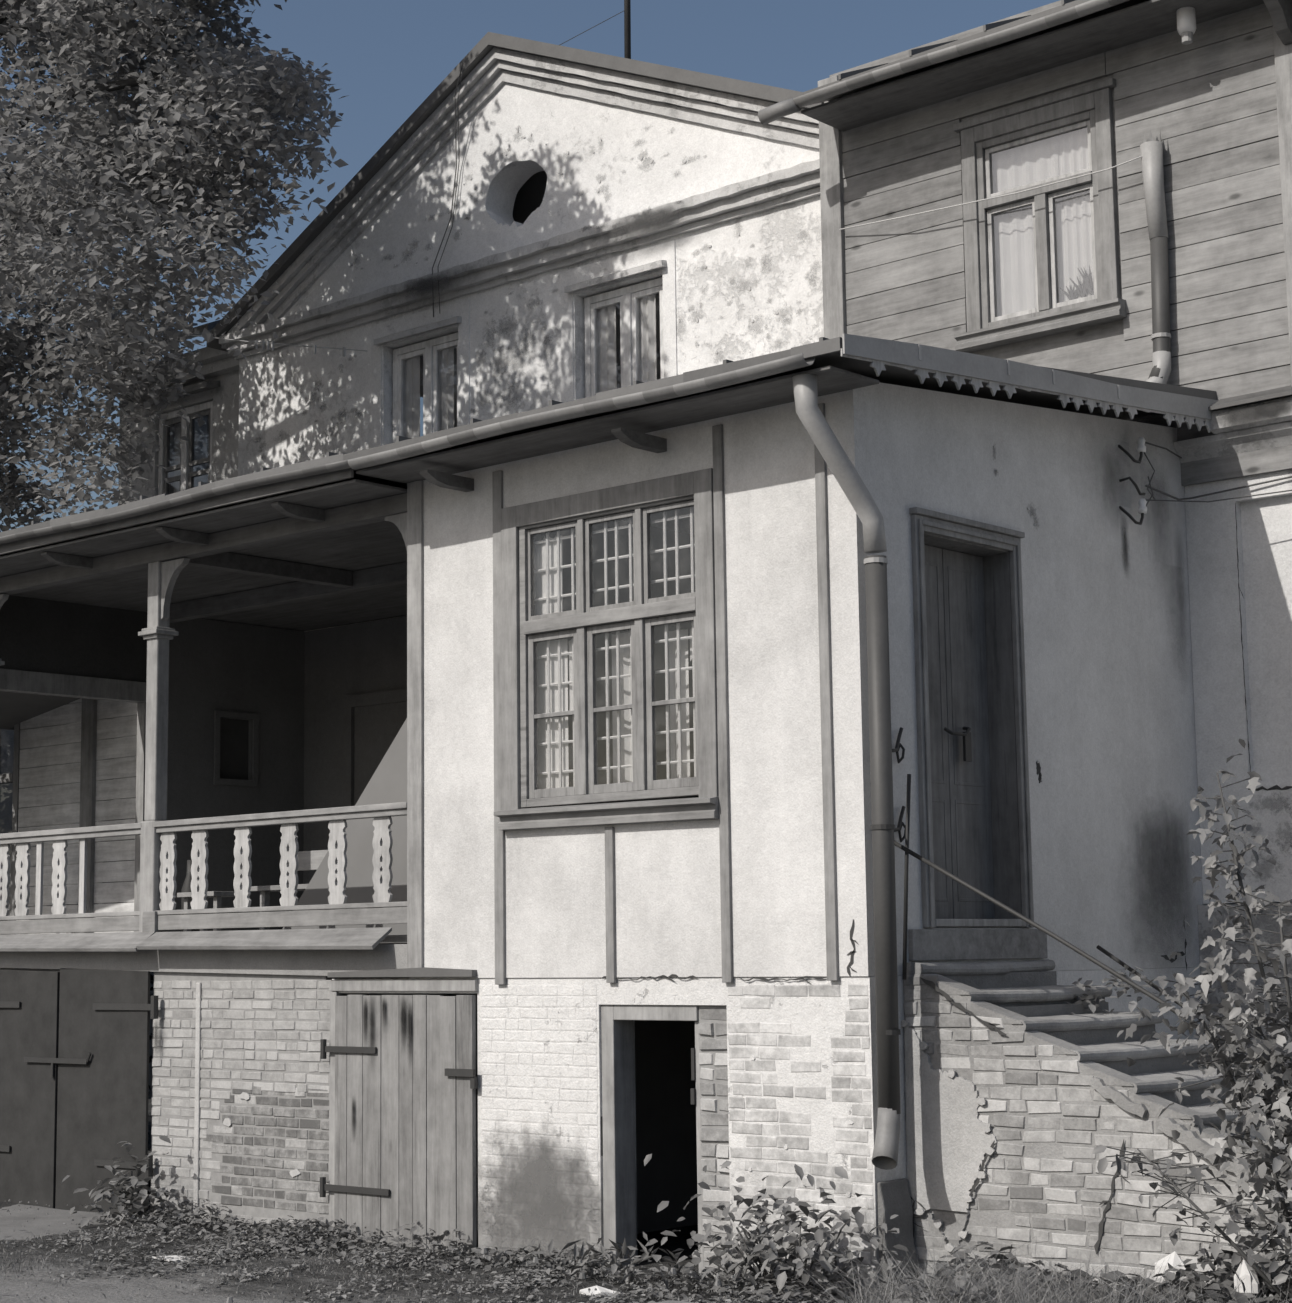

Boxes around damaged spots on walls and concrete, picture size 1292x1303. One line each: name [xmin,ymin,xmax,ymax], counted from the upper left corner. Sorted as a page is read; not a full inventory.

crack [738,919,859,984]
water stain [363,1000,411,1052]
flaking render [203,1085,329,1214]
water stain [497,1145,579,1256]
flaking render [901,975,1292,1303]
crack [1094,1140,1128,1254]